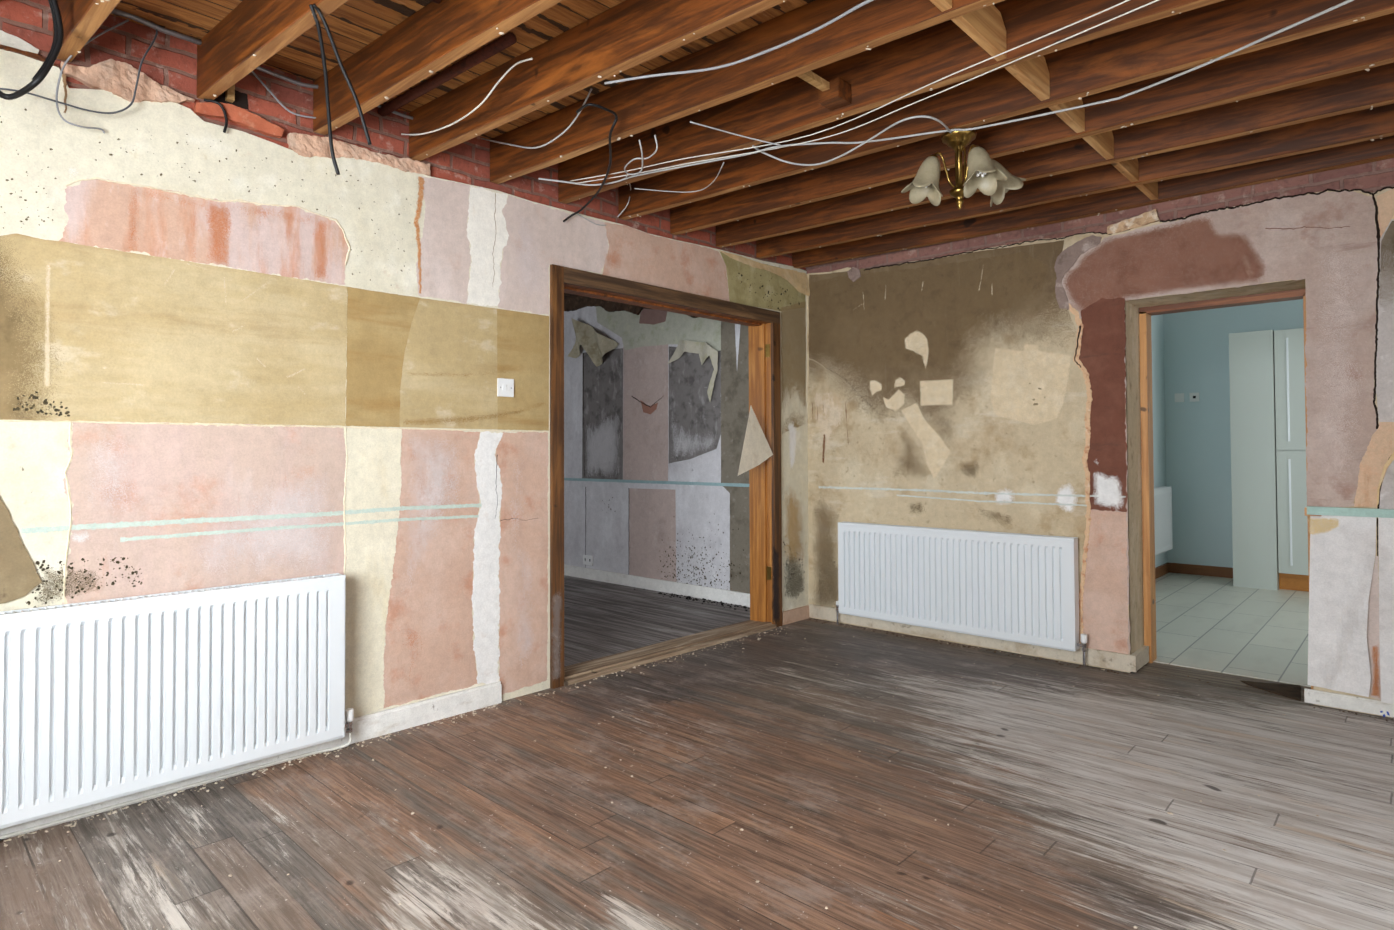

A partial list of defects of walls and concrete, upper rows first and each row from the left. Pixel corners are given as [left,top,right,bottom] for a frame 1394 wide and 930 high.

damp [0,236,70,421]
damp [26,557,142,608]
peeling [59,59,471,304]
peeling [0,420,549,708]
damp [582,348,623,480]
peeling [498,195,810,401]
damp [656,321,750,594]
damp [720,252,825,461]
crack [864,186,1394,556]
peeling [1054,189,1394,654]